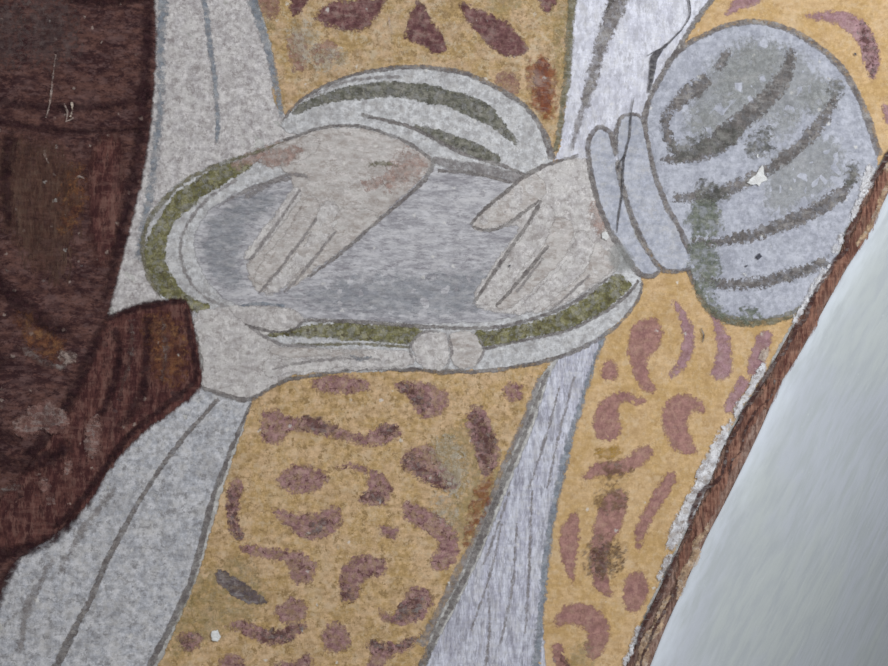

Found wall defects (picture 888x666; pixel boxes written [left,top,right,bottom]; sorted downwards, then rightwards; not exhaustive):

crack [617,0,691,231]
spalling [623,152,888,666]